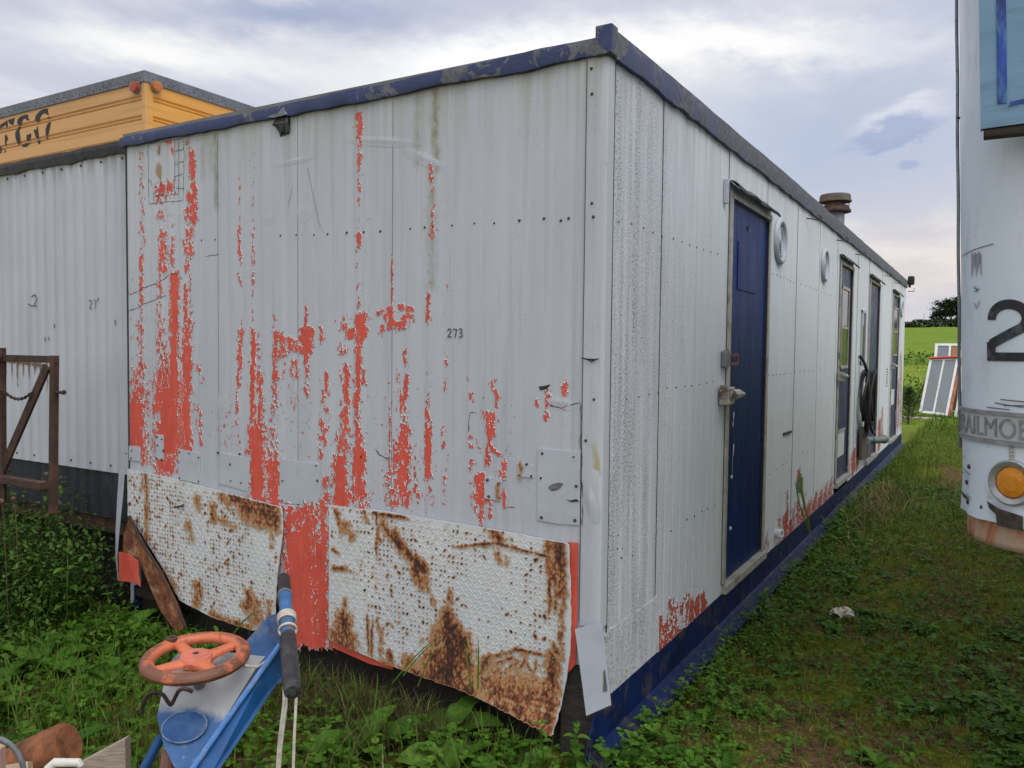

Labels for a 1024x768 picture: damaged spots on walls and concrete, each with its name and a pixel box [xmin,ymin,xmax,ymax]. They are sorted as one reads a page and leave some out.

peeling [353,112,364,206]
peeling [428,163,437,240]
peeling [129,139,204,477]
corrosion [128,473,281,631]
peeling [217,182,449,652]
corrosion [328,507,570,736]
peeling [467,377,515,527]
peeling [535,378,569,422]
peeling [658,586,708,652]
peeling [764,466,834,550]